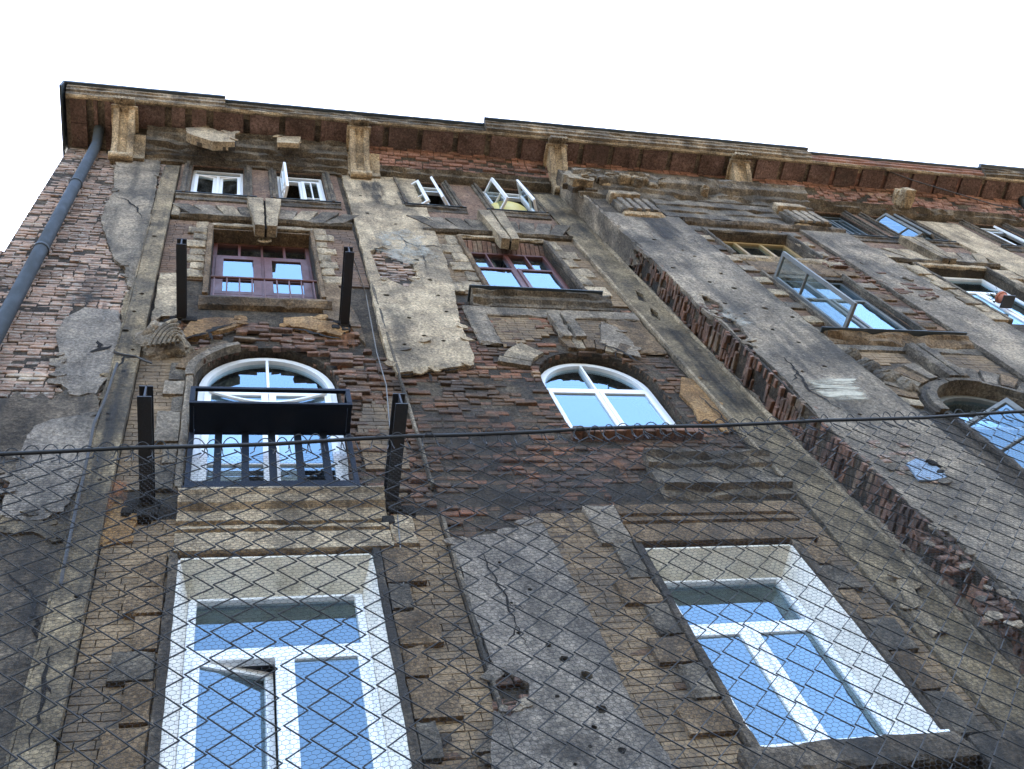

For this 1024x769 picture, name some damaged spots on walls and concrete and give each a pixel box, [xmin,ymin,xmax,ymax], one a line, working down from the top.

flaking render [0,148,166,549]
flaking render [181,175,745,769]
crack [484,555,529,648]
crack [784,358,839,408]
flaking render [629,239,1024,674]